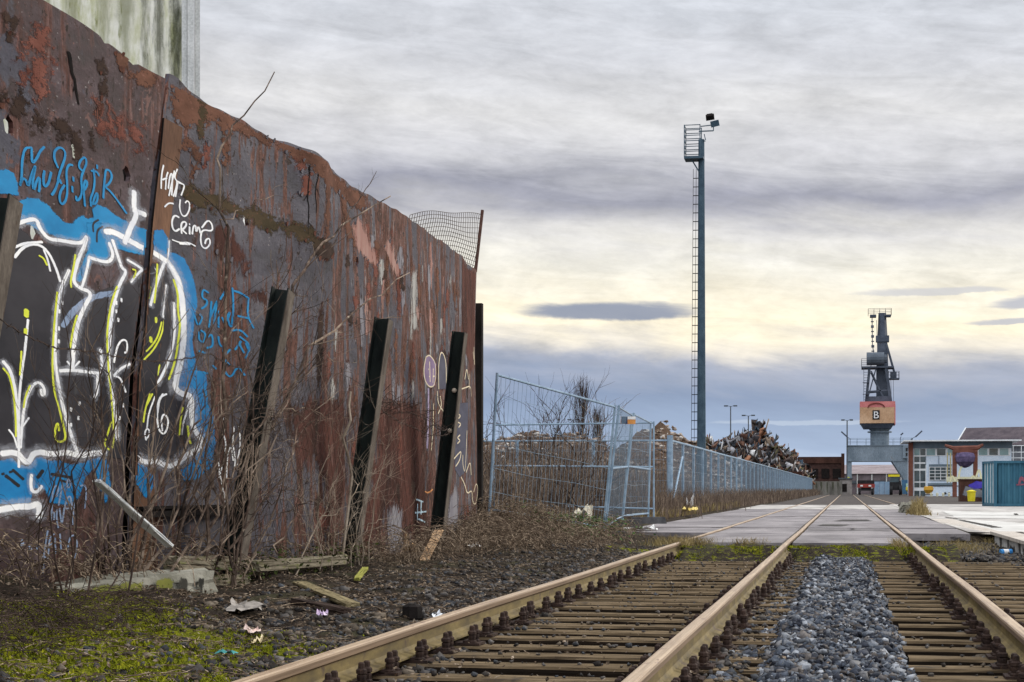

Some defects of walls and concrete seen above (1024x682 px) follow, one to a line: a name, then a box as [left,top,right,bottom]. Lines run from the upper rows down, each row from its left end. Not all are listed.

corrosion [14,16,59,109]
corrosion [91,93,149,155]
corrosion [123,69,158,88]
corrosion [180,162,476,554]